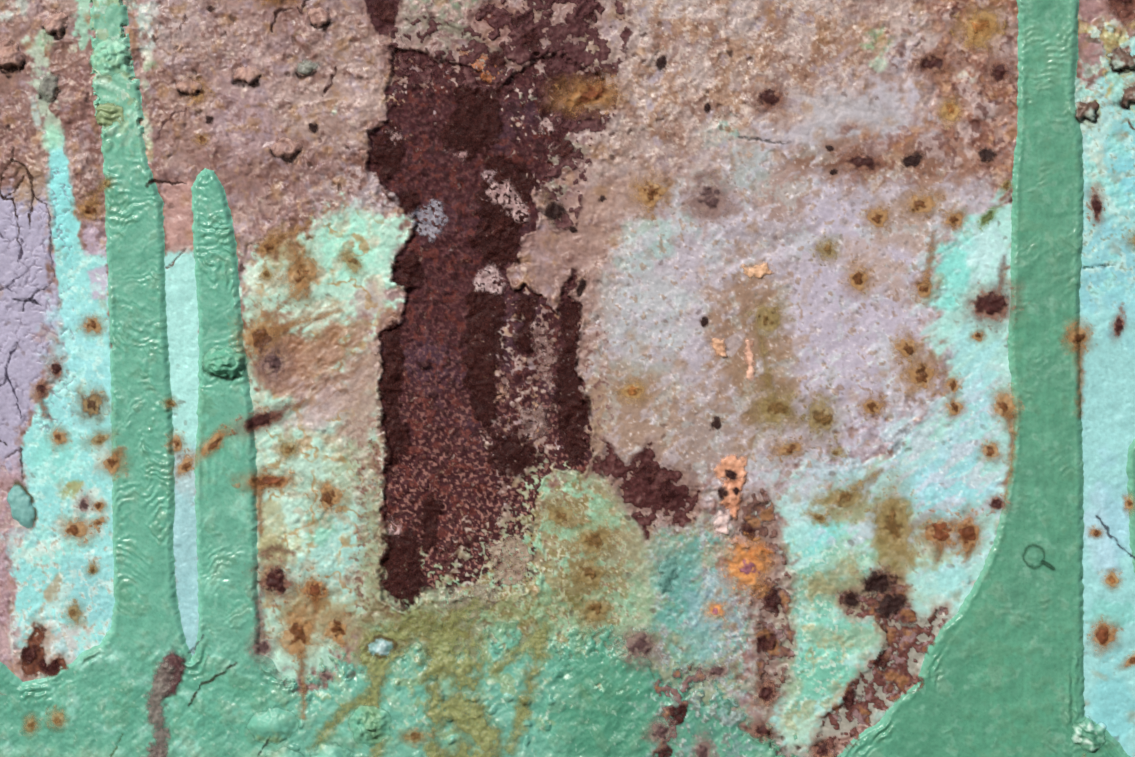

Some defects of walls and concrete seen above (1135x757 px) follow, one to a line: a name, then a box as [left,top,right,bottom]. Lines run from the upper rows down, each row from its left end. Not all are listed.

crack [0,148,55,312]
peeling [365,0,700,622]
peeling [742,263,772,278]
rust [967,263,1016,342]
crack [1,349,22,418]
rust [36,358,67,445]
rust [81,391,109,418]
peeling [745,340,755,380]
rust [894,337,963,416]
rust [64,490,105,543]
crack [1096,516,1135,559]
peeling [713,455,795,703]